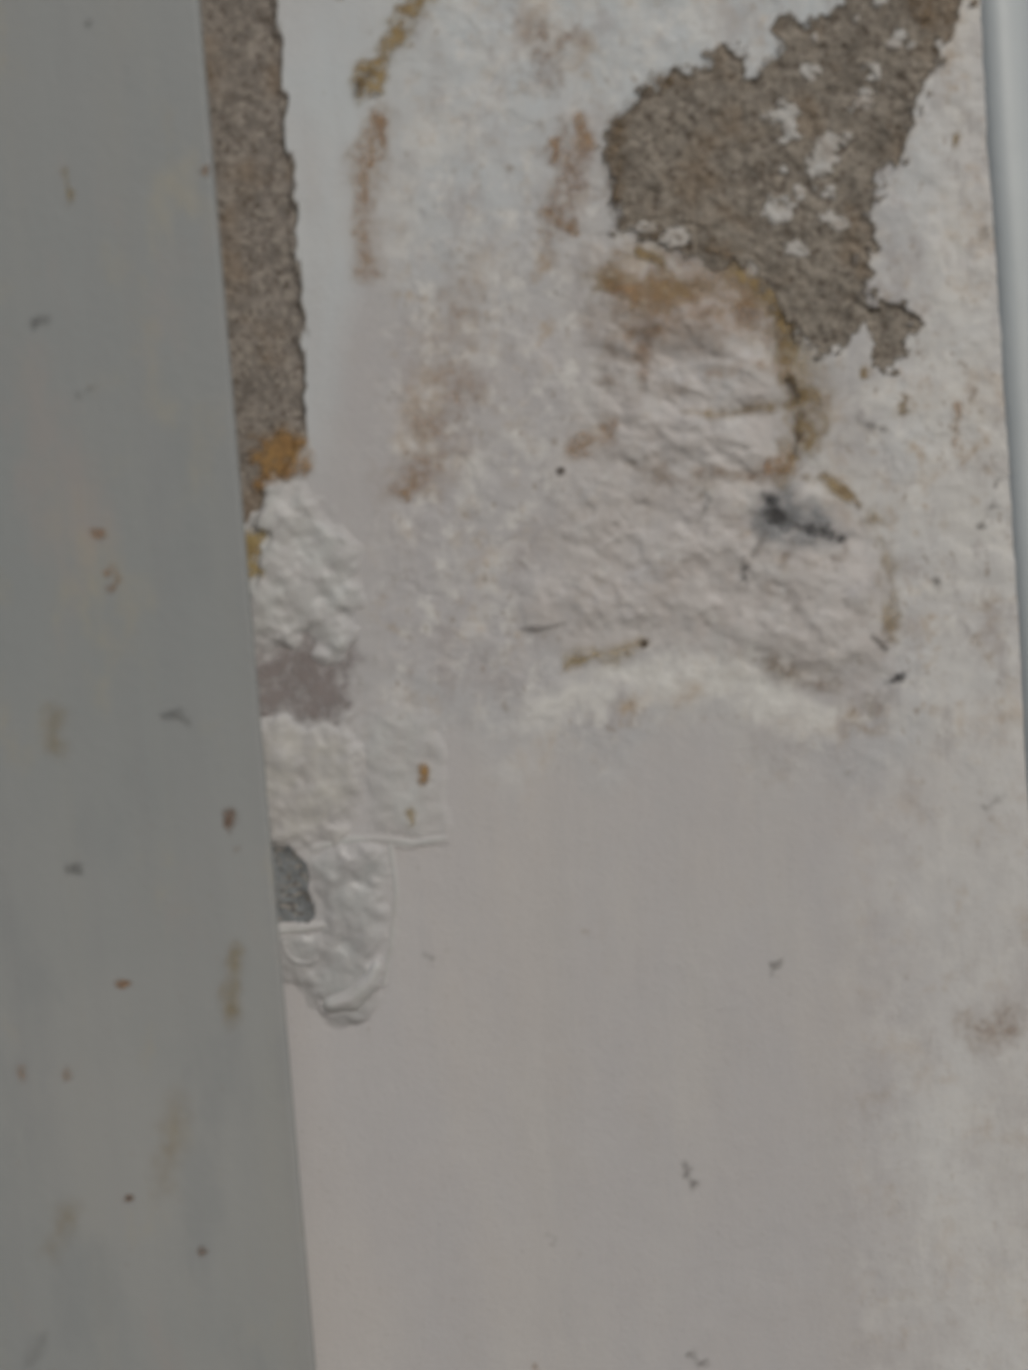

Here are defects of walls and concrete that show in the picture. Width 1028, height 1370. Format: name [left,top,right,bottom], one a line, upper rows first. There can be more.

flaking render [200,0,307,524]
rust [354,0,424,96]
water stain [599,246,702,311]
flaking render [597,0,979,378]